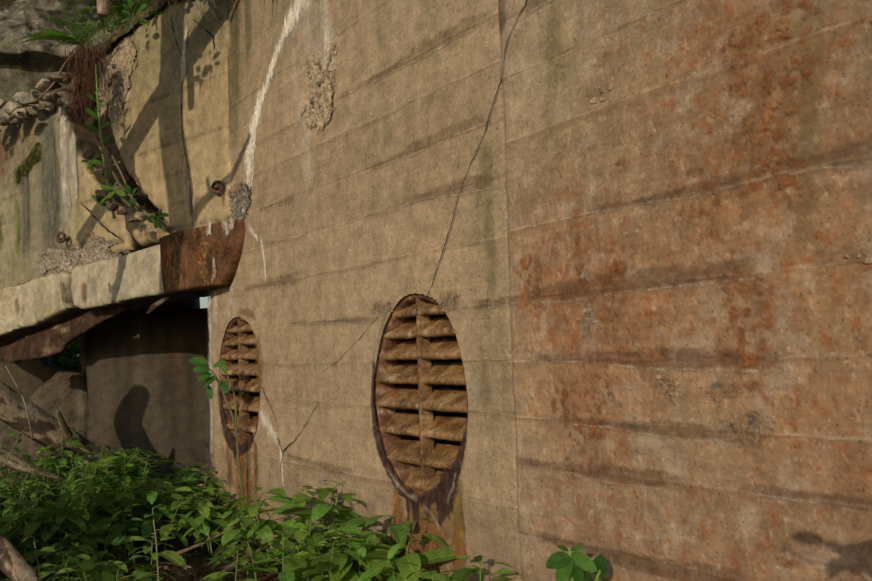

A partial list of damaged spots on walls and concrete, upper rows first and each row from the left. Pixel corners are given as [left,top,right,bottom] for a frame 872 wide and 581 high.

spalling [95,29,139,120]
crack [170,13,190,178]
leakage [244,0,310,208]
spalling [299,43,337,137]
leakage [320,0,333,78]
crack [427,0,527,295]
rust [722,0,818,203]
spalling [228,180,252,221]
rust [719,276,772,373]
rust [552,375,611,444]
rust [226,442,257,505]
rust [392,489,466,572]